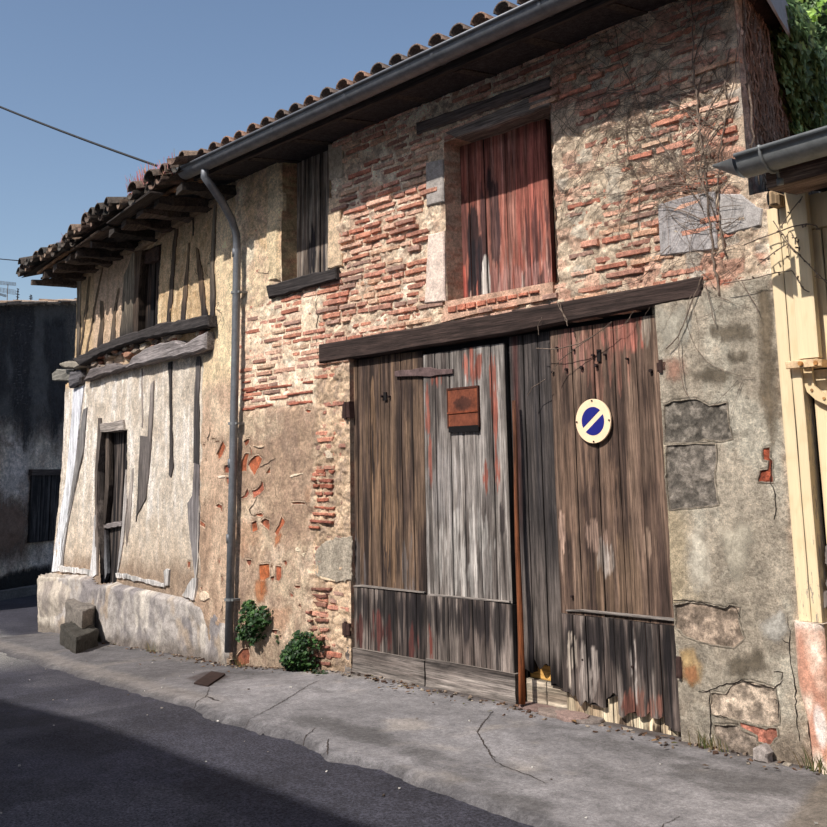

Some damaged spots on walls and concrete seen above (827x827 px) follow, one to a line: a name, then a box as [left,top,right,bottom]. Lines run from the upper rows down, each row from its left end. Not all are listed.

damp [0,304,76,450]
spalling [202,437,229,485]
spalling [239,438,271,500]
spalling [756,445,774,484]
damp [0,494,28,556]
spalling [250,512,286,536]
crack [698,616,800,741]
crack [477,713,541,781]